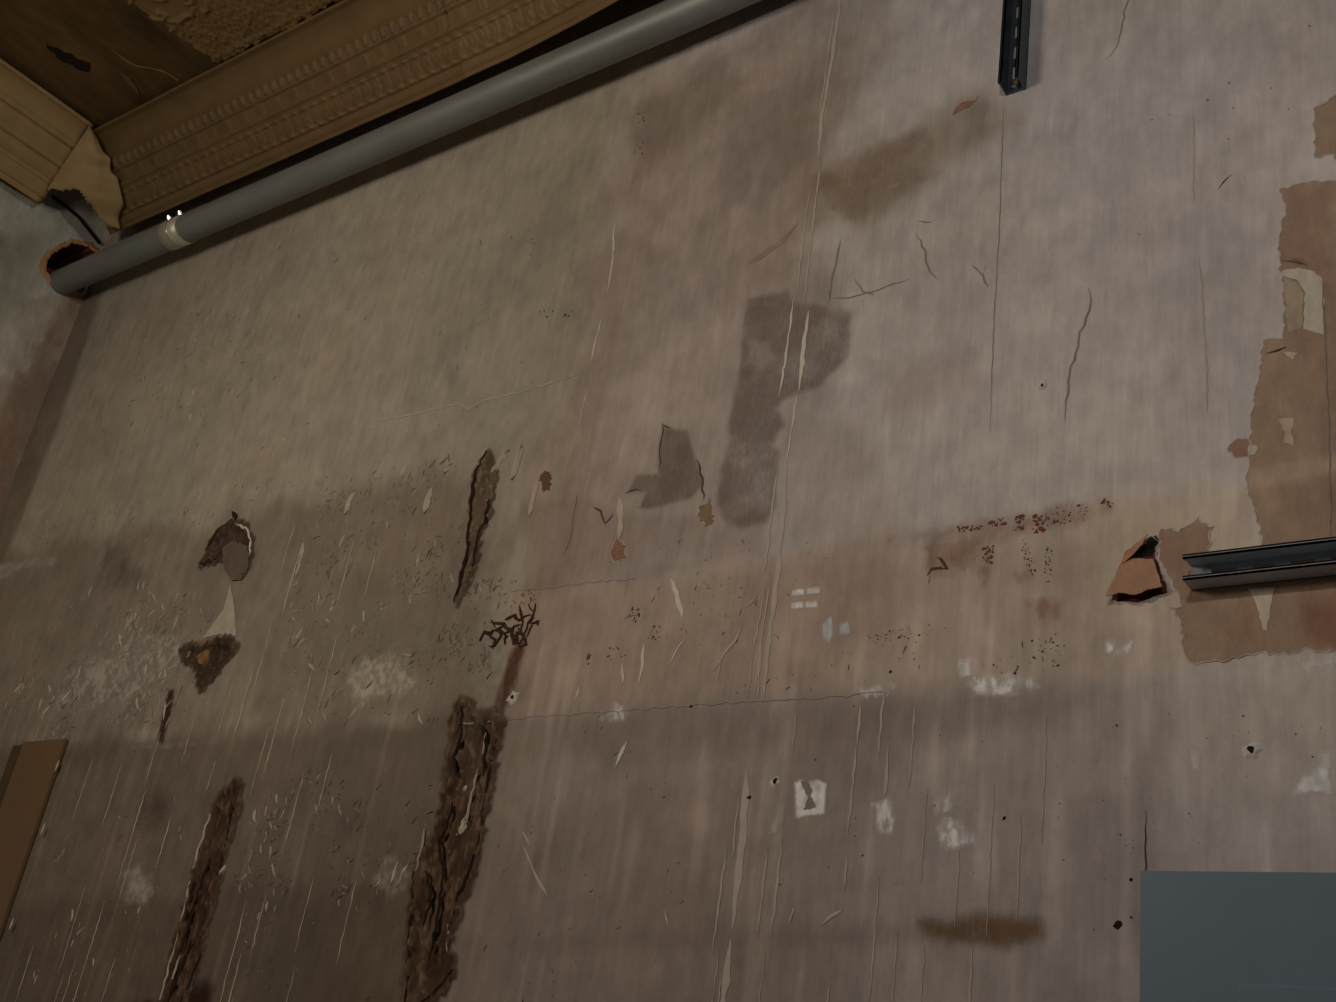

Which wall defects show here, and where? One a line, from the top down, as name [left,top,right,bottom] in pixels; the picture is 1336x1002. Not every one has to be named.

peeling [1311,94,1336,160]
spalling [39,239,101,286]
leakage [748,162,838,395]
peeling [1226,179,1336,545]
peeling [1155,516,1336,666]
spalling [4,445,536,1002]
leakage [920,792,1038,1002]